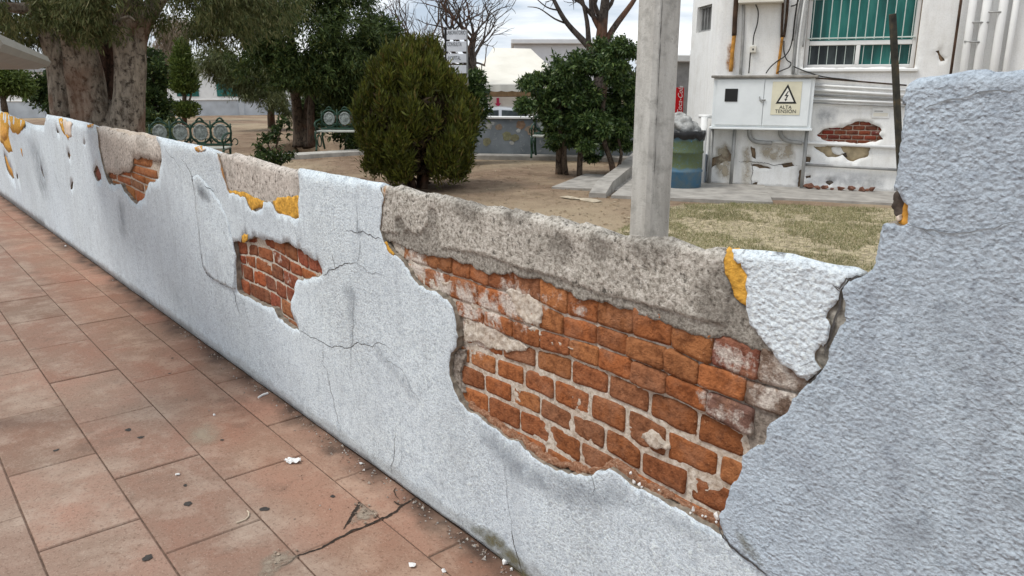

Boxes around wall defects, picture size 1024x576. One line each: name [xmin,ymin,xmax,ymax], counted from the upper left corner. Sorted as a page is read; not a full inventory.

peeling [0,112,25,178]
flaking render [87,124,162,202]
flaking render [219,152,305,219]
flaking render [783,121,883,187]
flaking render [237,233,322,327]
crack [301,205,421,426]
flaking render [381,185,846,530]